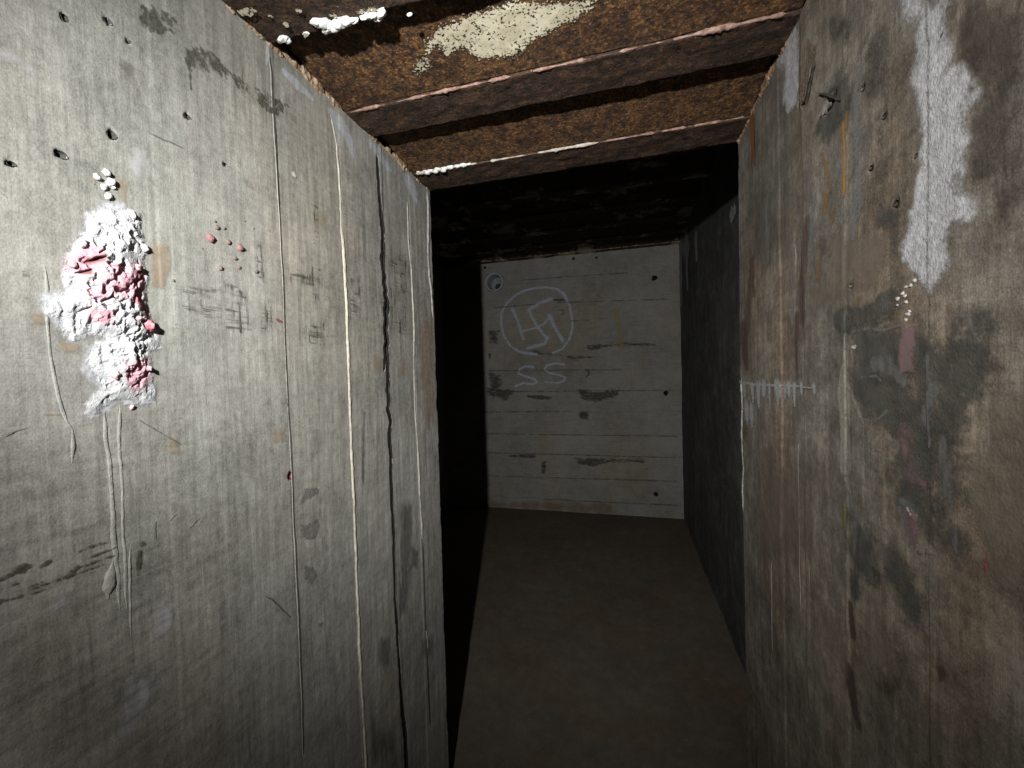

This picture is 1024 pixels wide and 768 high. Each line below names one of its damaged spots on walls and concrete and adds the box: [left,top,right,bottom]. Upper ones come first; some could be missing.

leakage [282,68,314,102]
leakage [266,7,387,65]
efflorescence [397,12,791,102]
leakage [330,104,384,158]
leakage [368,139,392,173]
leakage [812,0,1020,639]
crack [376,157,431,768]
leakage [845,664,861,730]